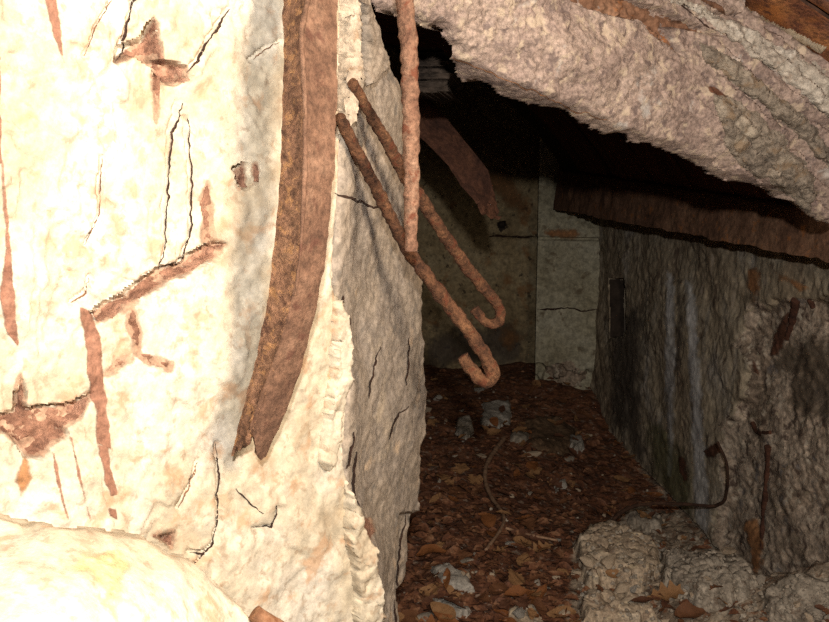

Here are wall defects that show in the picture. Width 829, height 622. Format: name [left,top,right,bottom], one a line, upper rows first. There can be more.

crack [83,0,136,62]
crack [187,9,230,72]
rust [701,0,726,15]
crack [85,159,103,244]
crack [159,103,194,274]
rust [770,313,790,355]
damp [779,341,829,414]
spalling [712,297,829,575]
rust [16,458,31,491]